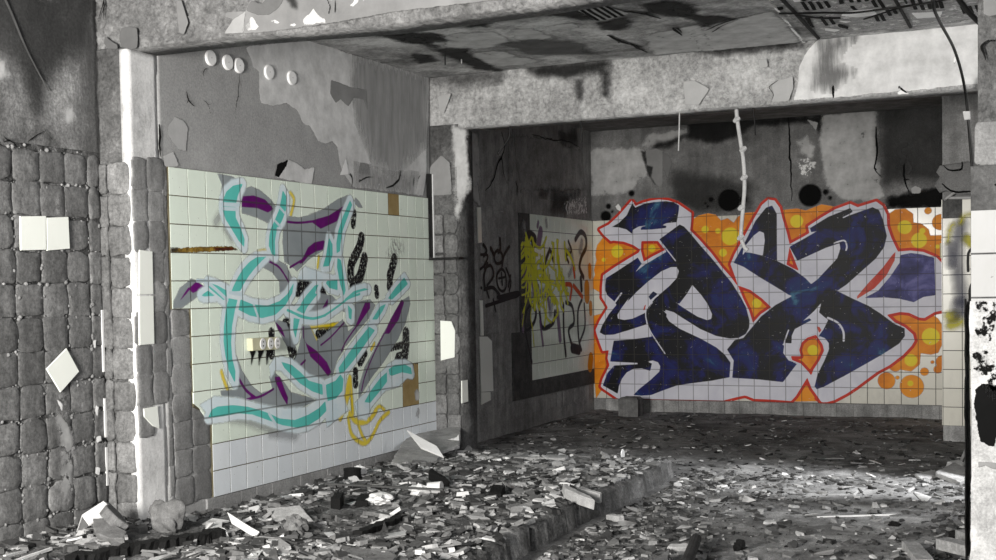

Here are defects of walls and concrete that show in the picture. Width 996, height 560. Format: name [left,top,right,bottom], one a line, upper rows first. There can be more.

peeling [246,17,259,31]
peeling [272,0,336,26]
spalling [579,6,628,21]
spalling [769,0,978,43]
damp [0,0,98,158]
flaking render [246,41,429,196]
flaking render [163,117,188,167]